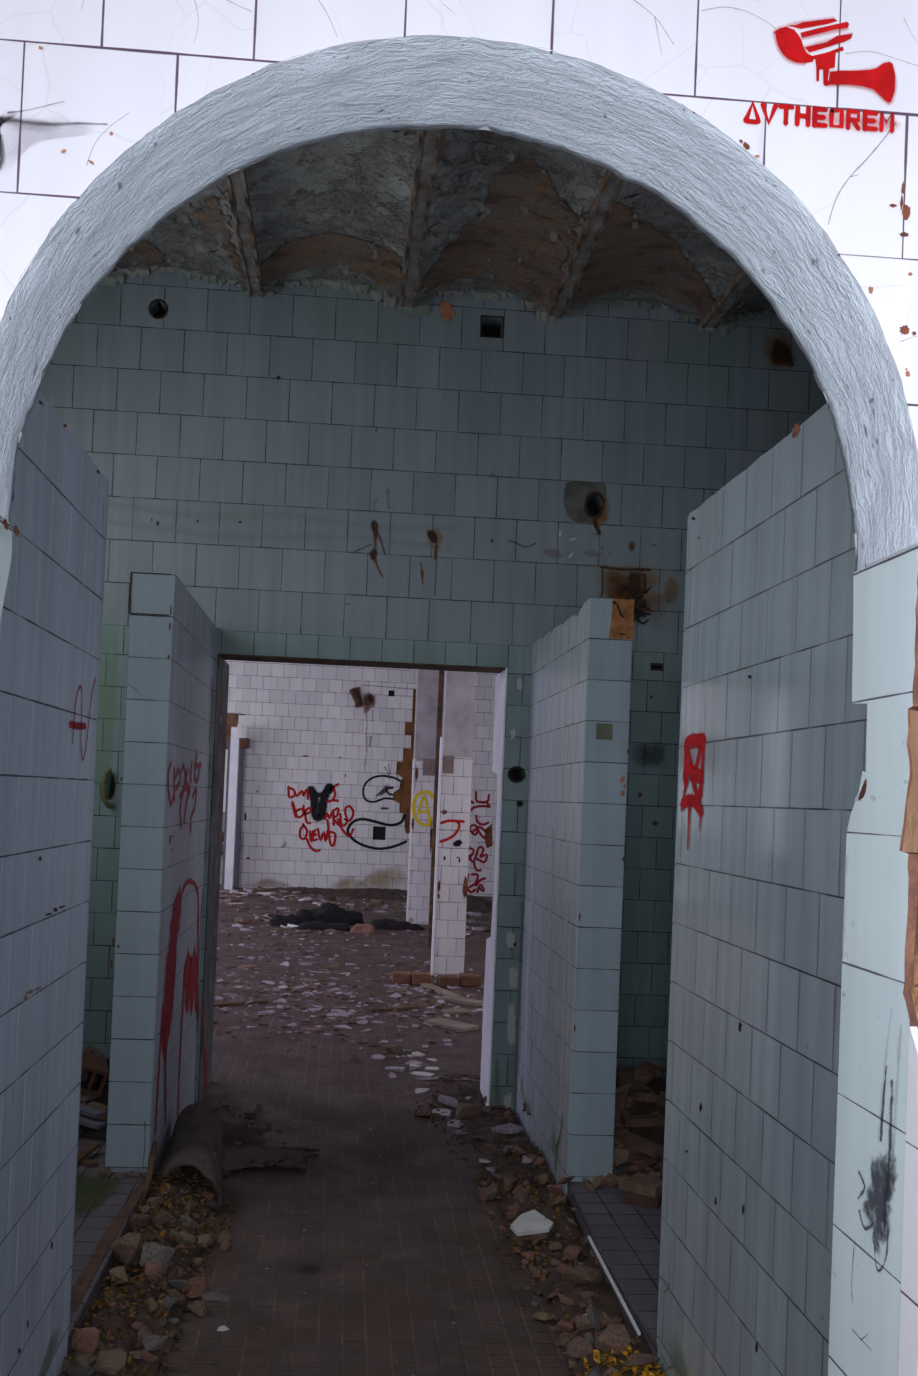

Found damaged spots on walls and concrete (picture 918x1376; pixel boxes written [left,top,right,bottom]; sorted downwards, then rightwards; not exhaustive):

damp [0,101,92,167]
flaking render [115,241,172,270]
rust [354,488,390,578]
rust [420,531,440,595]
rust [601,567,675,609]
spalling [902,710,918,873]
damp [851,1066,893,1303]